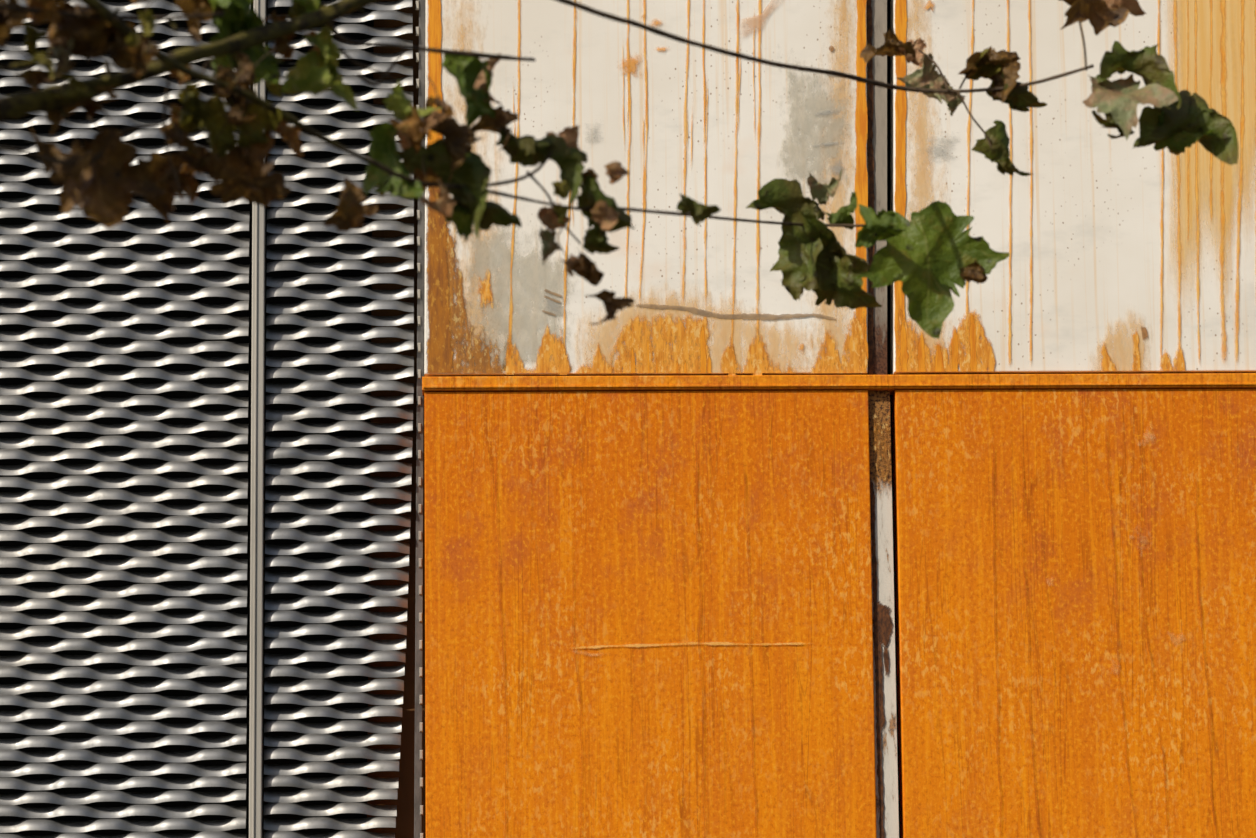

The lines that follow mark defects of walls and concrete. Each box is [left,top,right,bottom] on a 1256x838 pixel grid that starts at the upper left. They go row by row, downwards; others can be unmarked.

corrosion [426,0,875,375]
corrosion [894,0,933,217]
corrosion [894,109,1012,372]
corrosion [1101,0,1256,371]
corrosion [870,414,892,838]